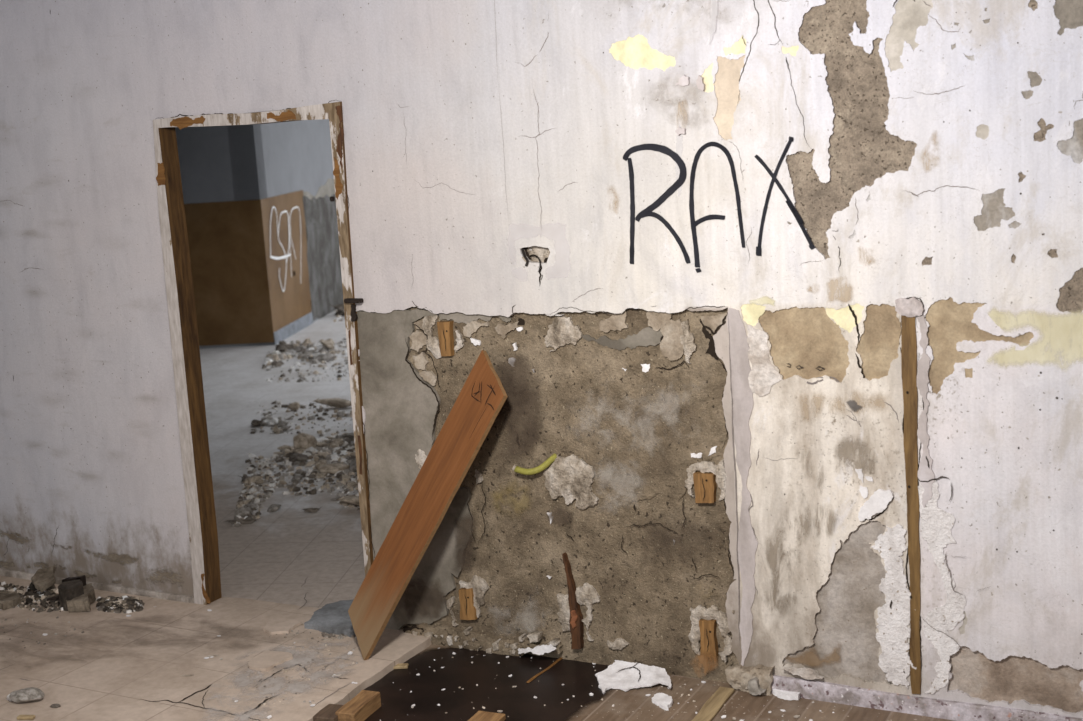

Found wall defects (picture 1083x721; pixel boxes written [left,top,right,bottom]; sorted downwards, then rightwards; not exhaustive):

crack [494,0,577,237]
spalling [609,34,746,140]
crack [738,0,808,143]
spalling [782,0,933,259]
peeling [1053,0,1083,36]
spalling [521,246,550,272]
crack [551,288,655,314]
spalling [741,297,902,396]
spalling [925,268,1083,394]
spalling [357,307,739,683]
spalling [783,469,1083,713]
crack [143,658,353,721]